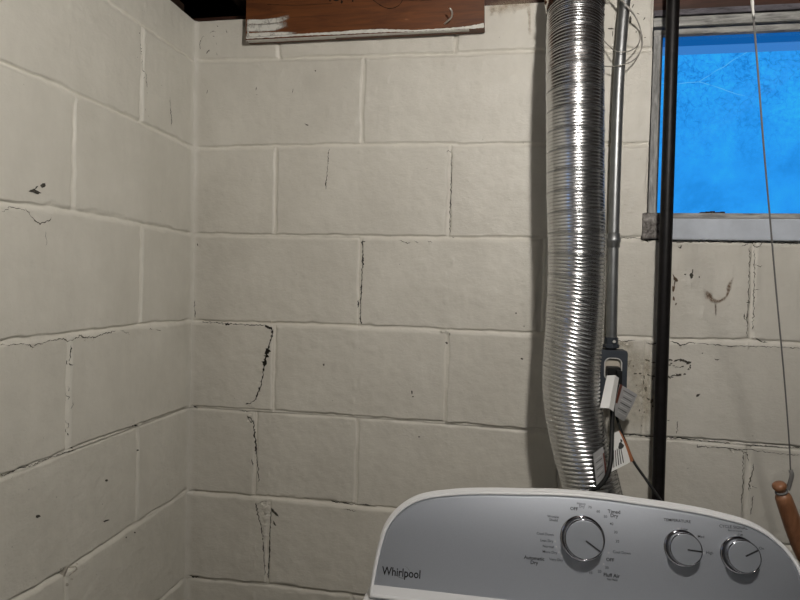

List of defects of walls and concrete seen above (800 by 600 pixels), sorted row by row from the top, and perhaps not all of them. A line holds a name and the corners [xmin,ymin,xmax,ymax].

crack [358,241,366,324]
crack [618,237,795,349]
crack [194,302,274,482]
crack [624,433,799,513]
crack [255,501,272,578]